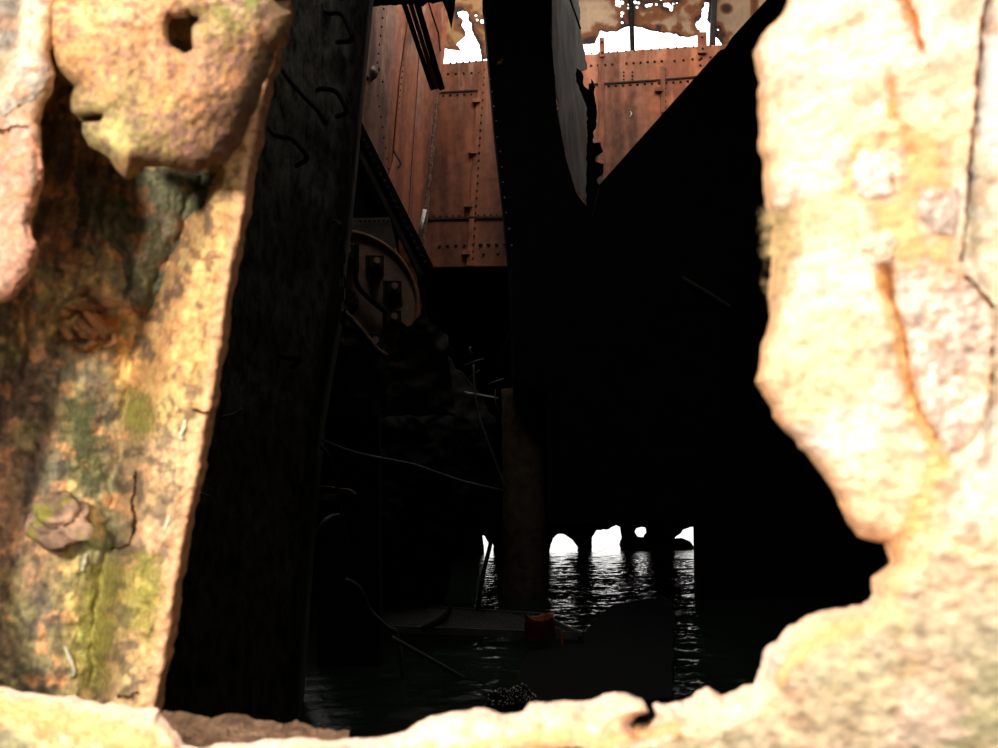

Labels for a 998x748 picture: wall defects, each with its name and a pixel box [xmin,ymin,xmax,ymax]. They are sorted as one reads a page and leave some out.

crack [0,95,36,135]
peeling [0,134,44,300]
peeling [0,64,51,117]
corrosion [50,0,293,180]
peeling [576,69,604,216]
peeling [852,150,894,199]
corrosion [899,0,922,47]
crack [949,0,995,402]
peeling [60,285,119,351]
corrosion [866,77,952,554]